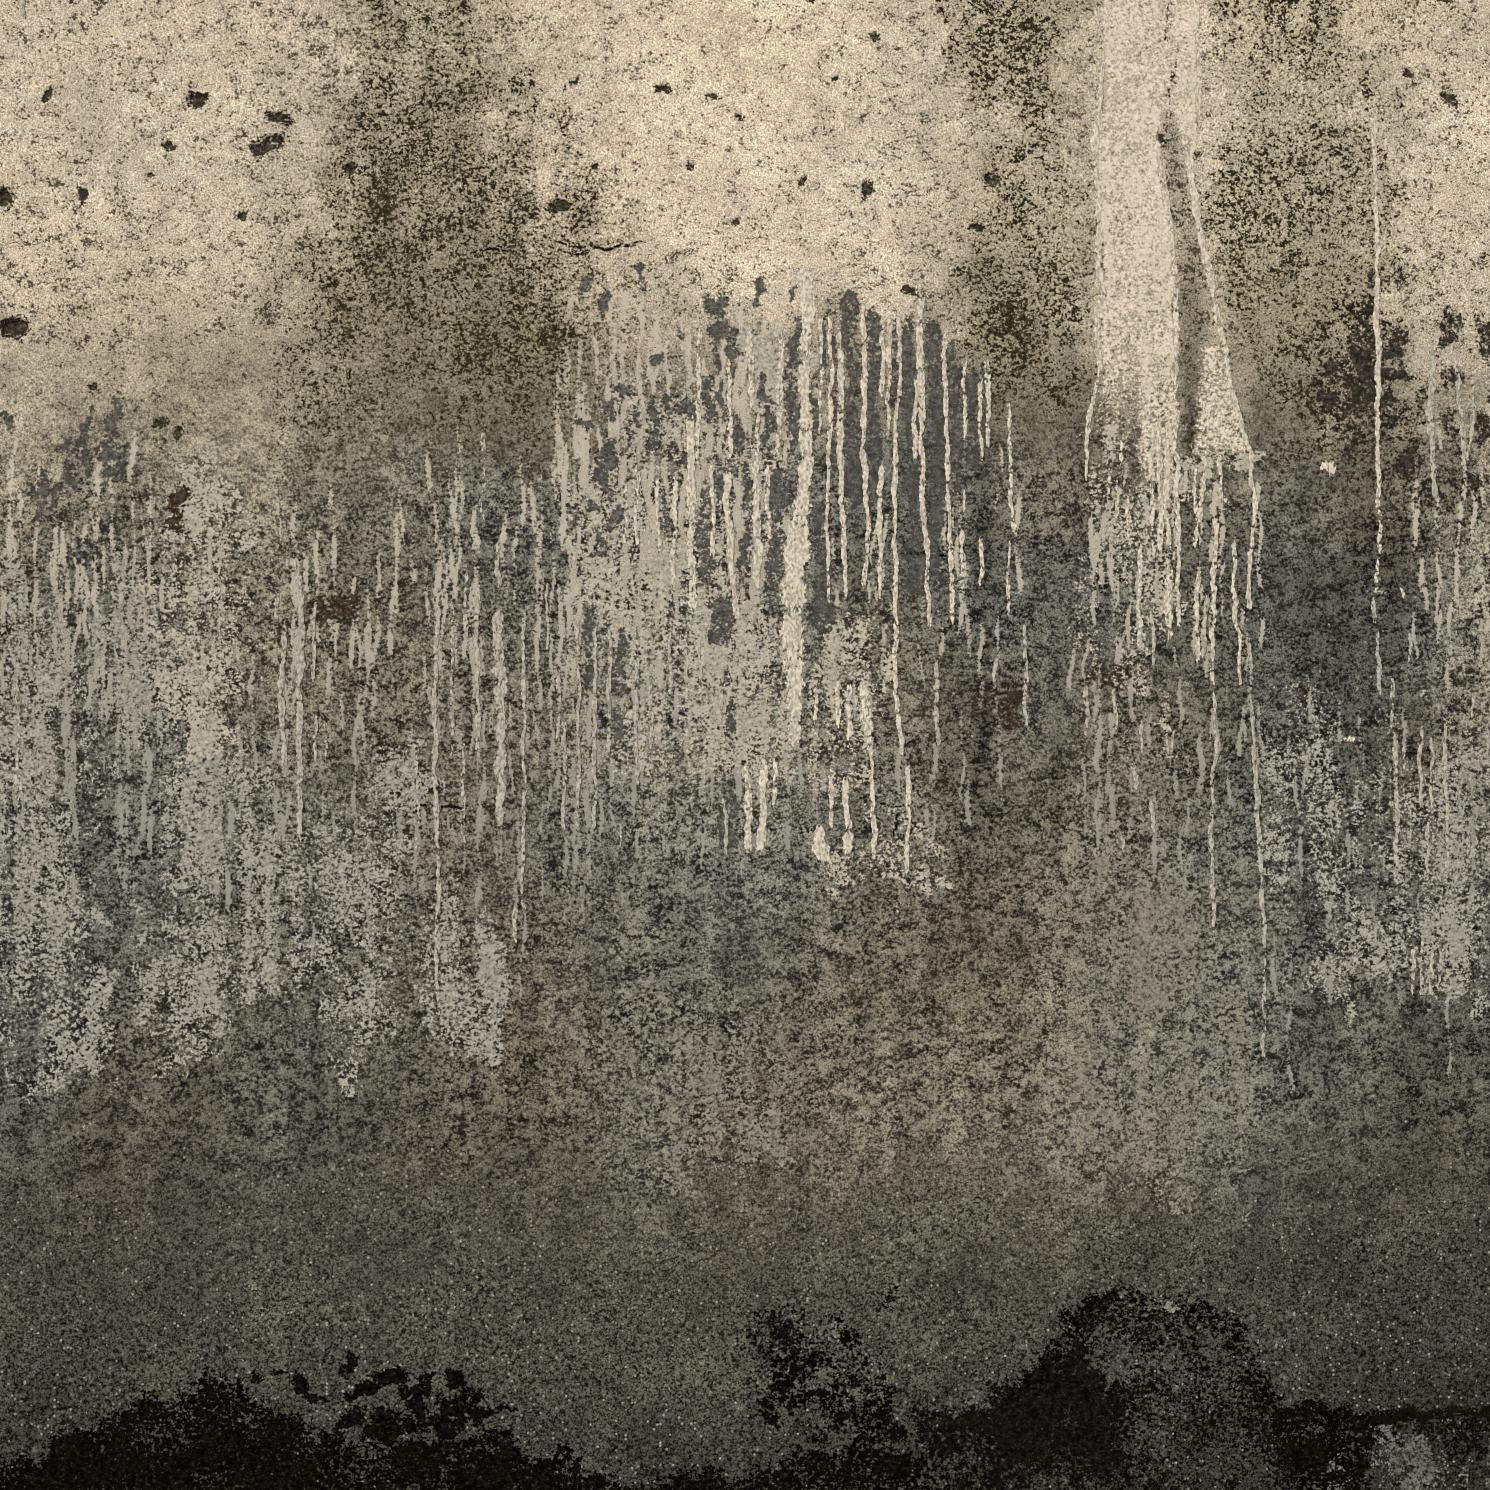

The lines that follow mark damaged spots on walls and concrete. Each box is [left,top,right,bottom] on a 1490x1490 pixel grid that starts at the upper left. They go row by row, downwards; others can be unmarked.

leakage [0,442,803,1199]
leakage [459,425,486,520]
leakage [555,265,1029,912]
leakage [1032,0,1490,1215]
leakage [0,1285,1490,1490]
crack [1368,1404,1490,1452]